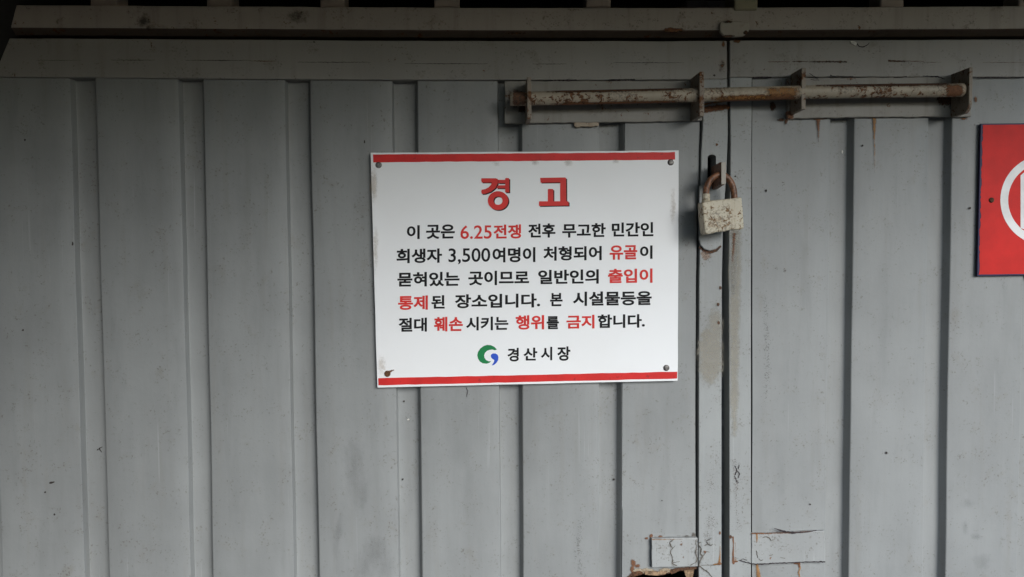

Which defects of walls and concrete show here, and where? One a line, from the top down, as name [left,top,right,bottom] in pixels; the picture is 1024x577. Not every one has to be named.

corrosion [704,87,797,124]
corrosion [816,83,977,108]